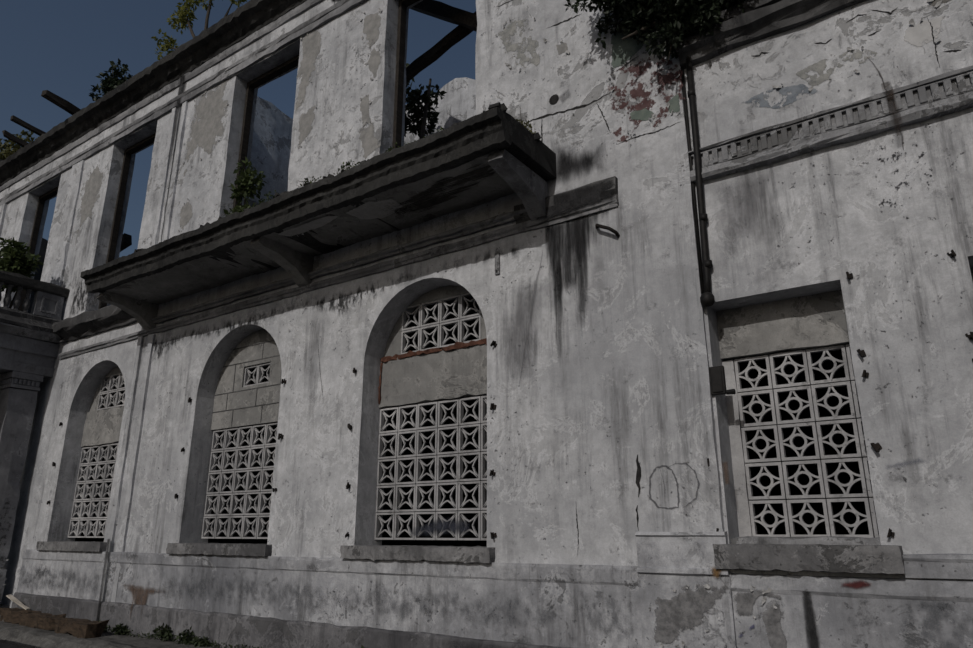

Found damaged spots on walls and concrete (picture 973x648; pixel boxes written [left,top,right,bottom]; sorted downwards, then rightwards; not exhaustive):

peeling [495,18,570,72]
crack [928,20,960,67]
peeling [182,79,229,176]
crack [530,57,679,145]
peeling [608,31,684,142]
peeling [742,46,877,109]
water stain [556,151,596,179]
water stain [537,180,612,318]
water stain [293,286,384,312]
water stain [154,311,276,357]
spalling [649,584,787,648]